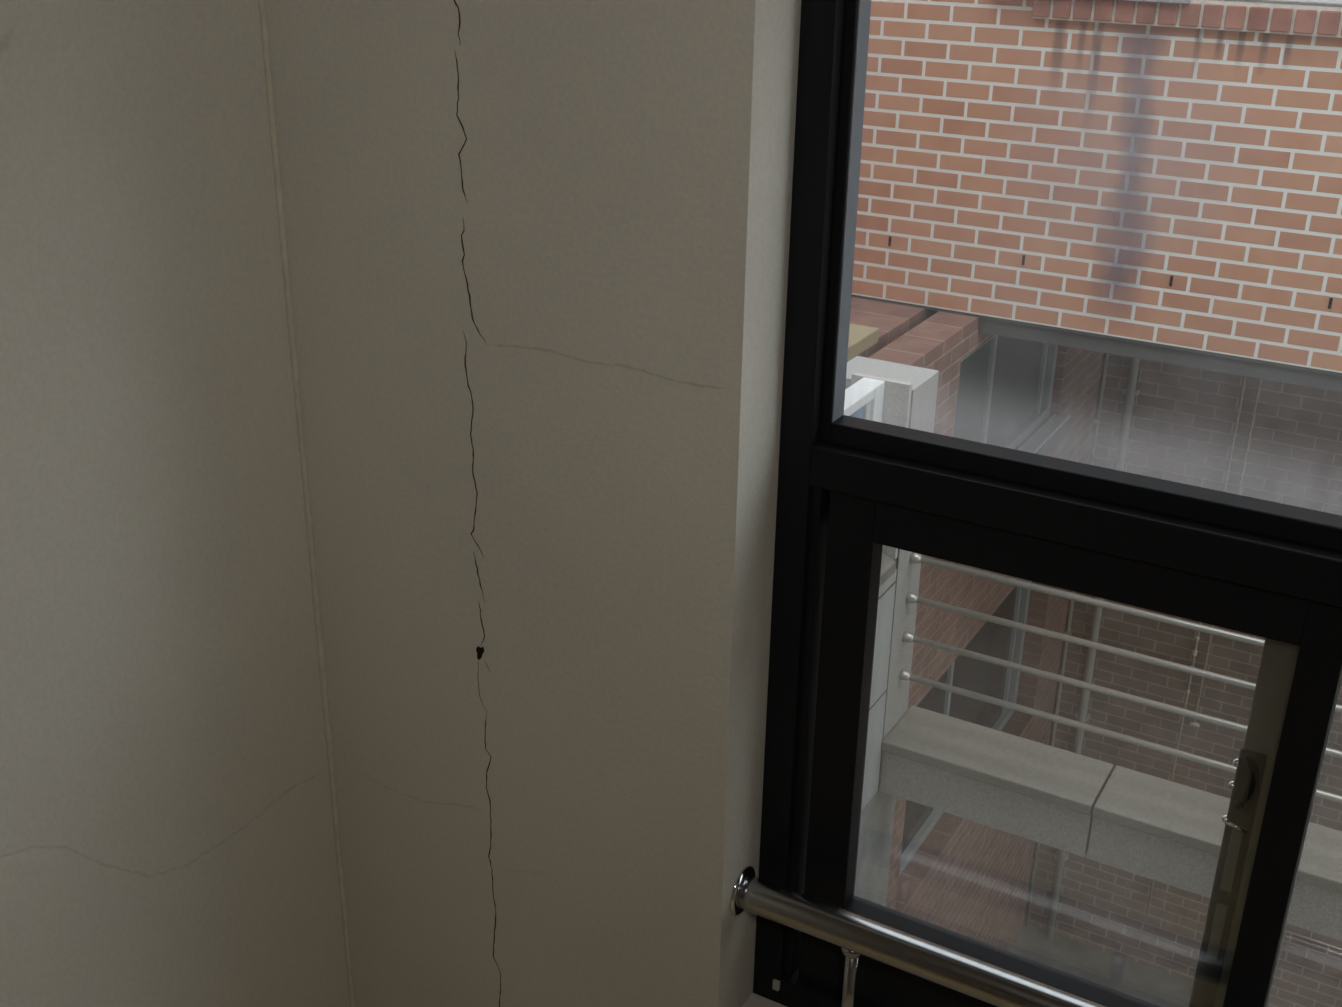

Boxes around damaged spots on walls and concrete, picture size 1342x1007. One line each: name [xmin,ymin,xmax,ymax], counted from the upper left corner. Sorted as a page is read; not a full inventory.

crack [454,0,501,1007]